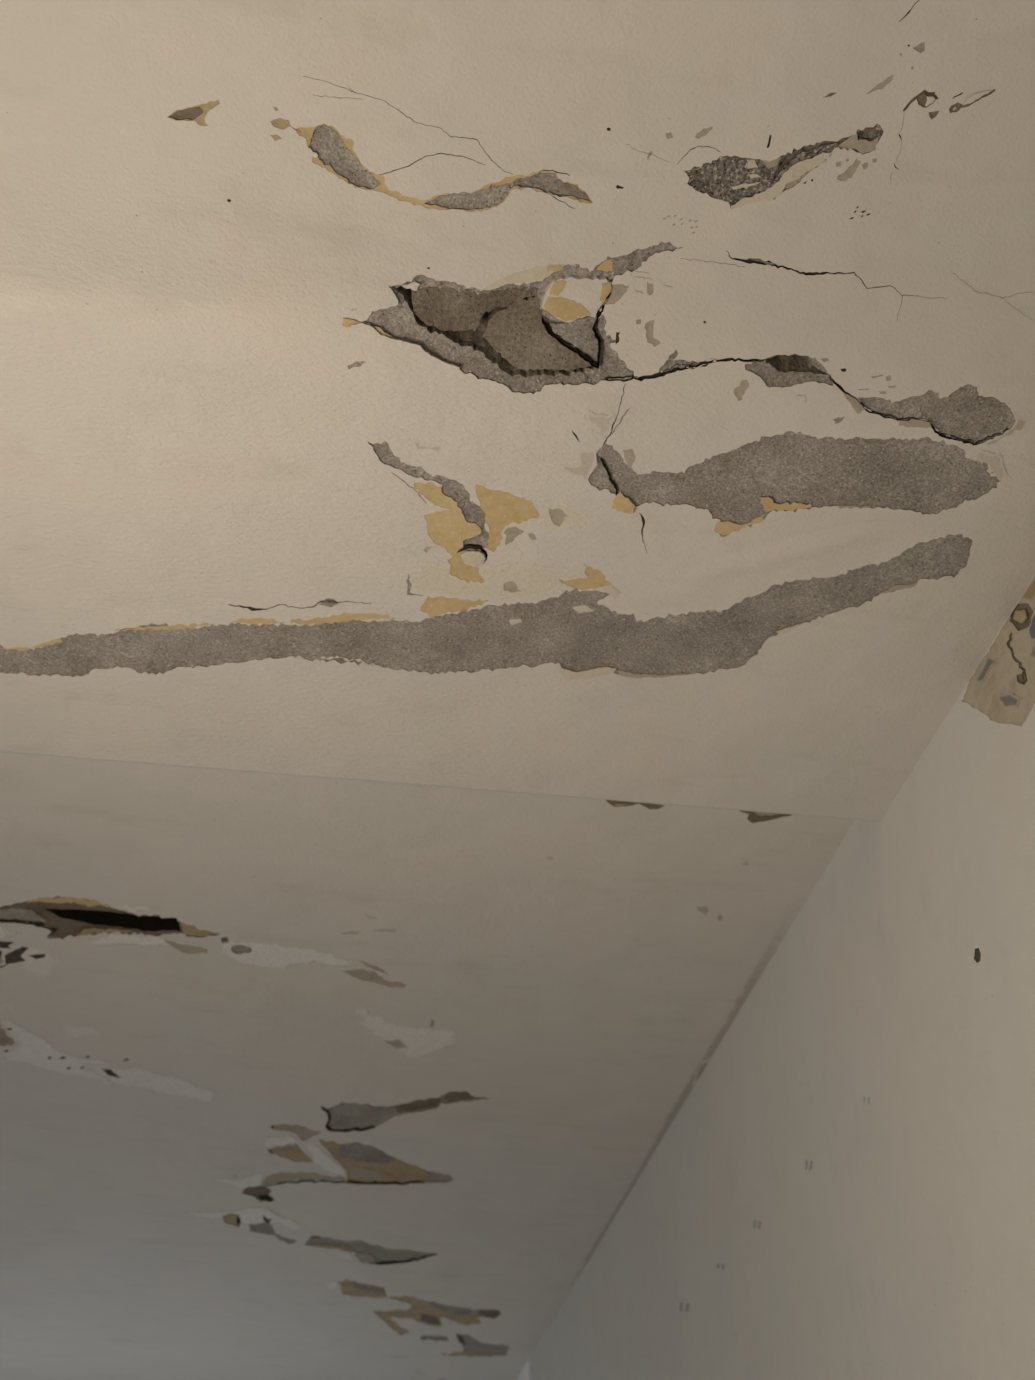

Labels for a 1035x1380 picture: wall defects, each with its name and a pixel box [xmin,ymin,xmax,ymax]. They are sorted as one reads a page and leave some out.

peeling [271,107,593,212]
spalling [685,124,884,209]
spalling [342,215,698,394]
spalling [561,353,1031,537]
spalling [0,441,972,681]
spalling [606,800,665,809]
spalling [739,810,791,823]
spalling [0,896,252,968]
peeling [343,961,407,988]
spalling [0,1028,14,1052]
spalling [182,1091,491,1265]
spalling [326,1278,510,1357]